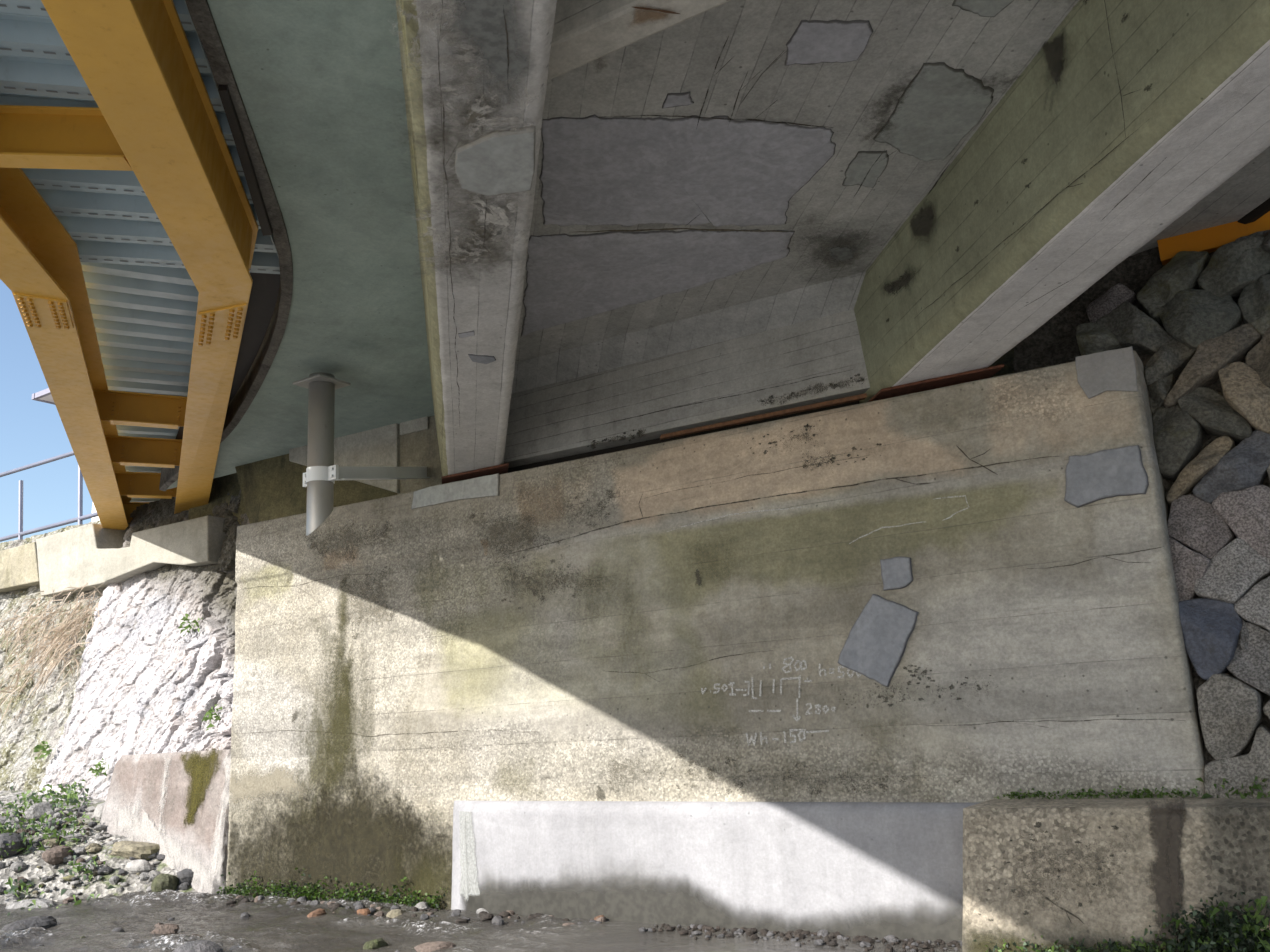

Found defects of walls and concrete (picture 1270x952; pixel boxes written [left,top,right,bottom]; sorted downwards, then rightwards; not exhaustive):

crack [579,214,794,232]
spalling [761,374,864,406]
damp [114,650,963,942]
damp [1147,798,1186,952]